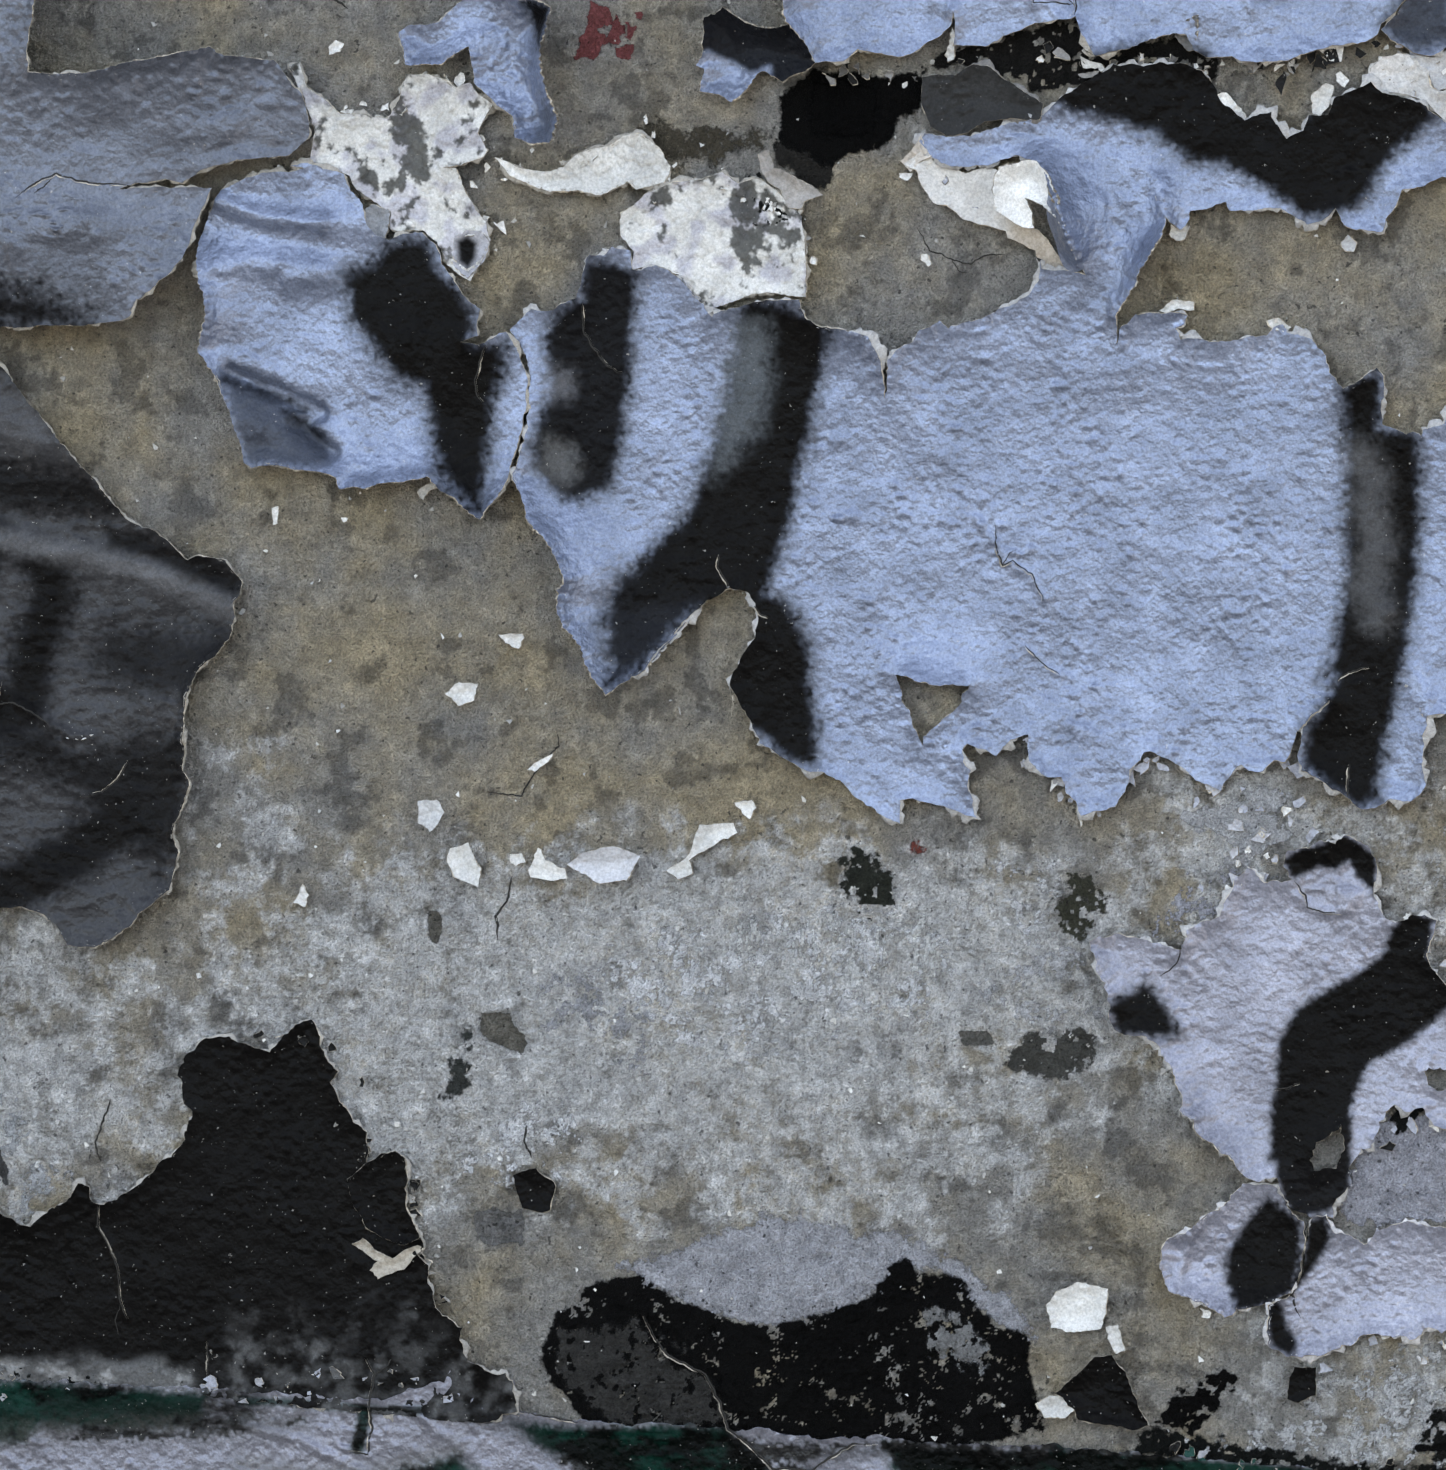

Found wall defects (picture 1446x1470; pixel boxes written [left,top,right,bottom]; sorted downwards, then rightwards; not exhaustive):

peeling [0,0,1446,827]
peeling [0,362,243,949]
peeling [417,799,444,832]
peeling [666,799,757,880]
peeling [446,842,482,887]
peeling [509,846,641,884]
peeling [293,883,309,907]
spalling [427,910,442,943]
spalling [480,1012,528,1053]
peeling [1089,805,1446,1403]
peeling [0,1019,1313,1470]